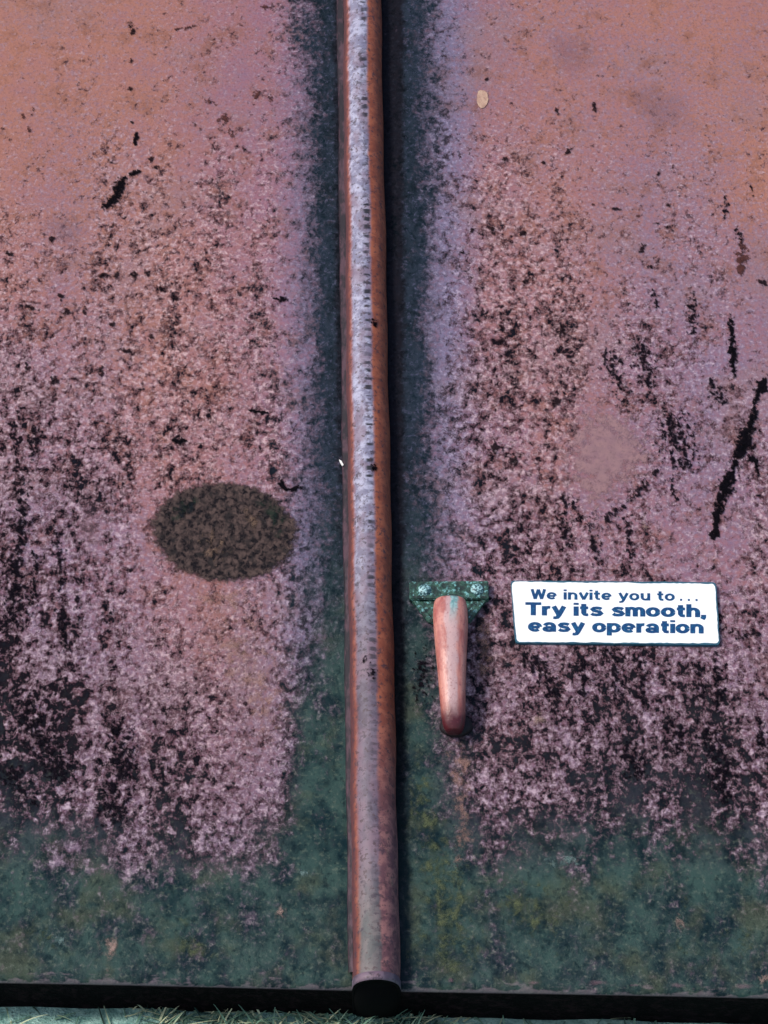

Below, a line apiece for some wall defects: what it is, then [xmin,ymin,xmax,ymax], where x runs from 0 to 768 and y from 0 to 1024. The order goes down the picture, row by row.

corrosion [99,270,150,280]
corrosion [487,441,521,466]
crack [708,377,768,540]
damp [150,476,302,582]
damp [0,688,77,808]
damp [86,708,151,831]
damp [610,738,652,780]
damp [660,651,768,809]